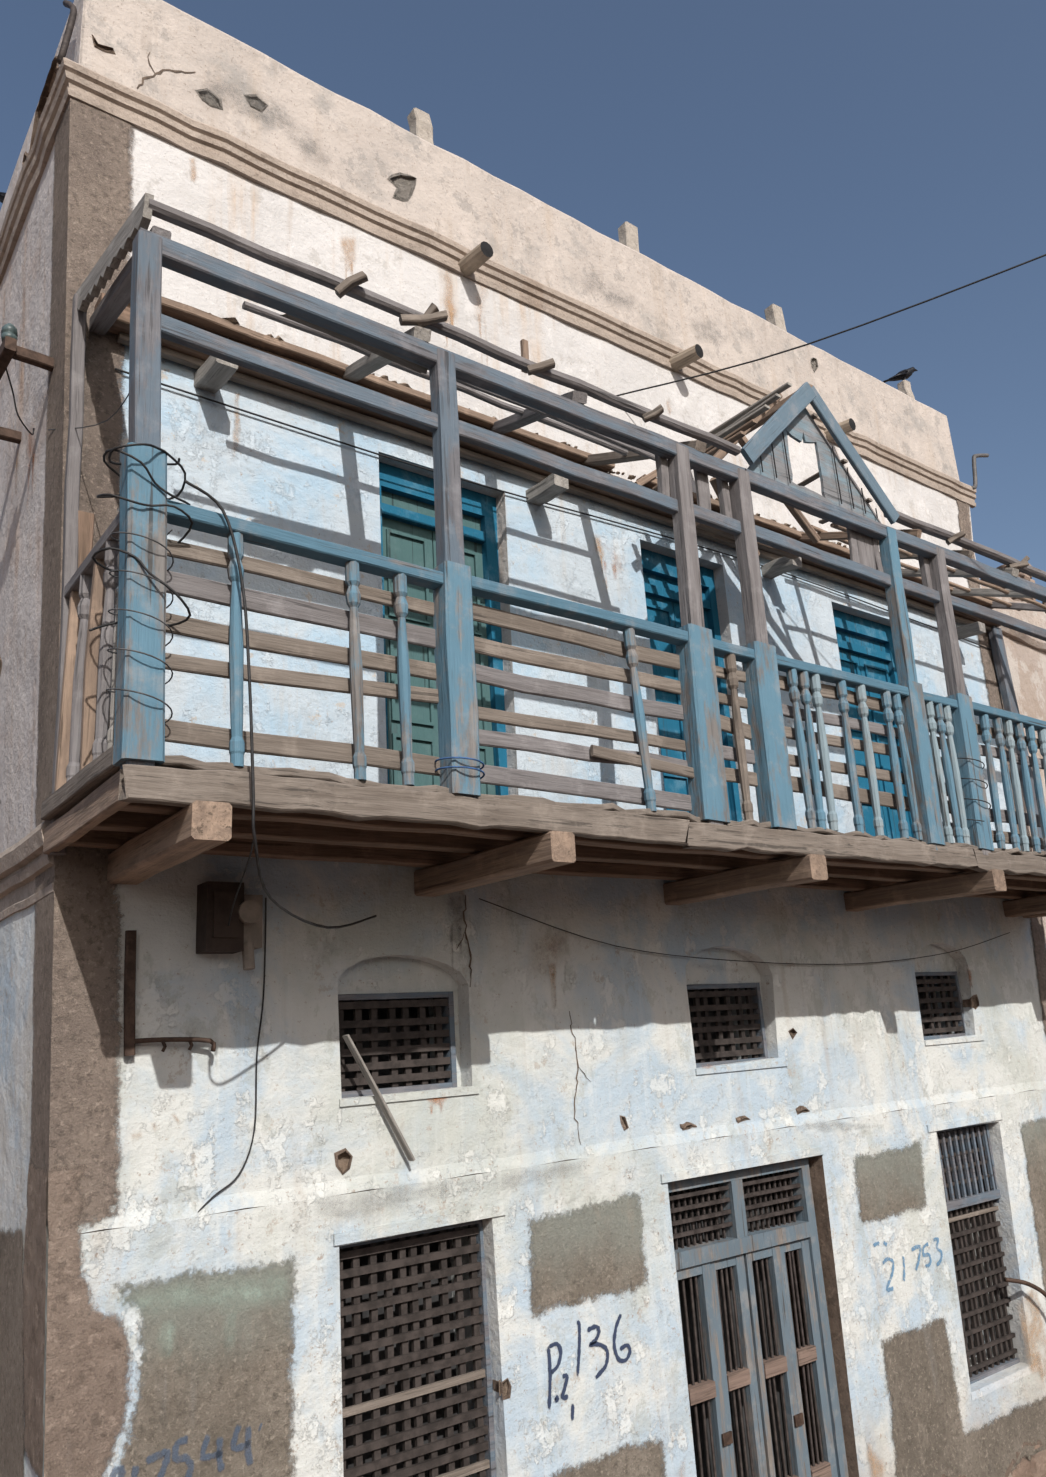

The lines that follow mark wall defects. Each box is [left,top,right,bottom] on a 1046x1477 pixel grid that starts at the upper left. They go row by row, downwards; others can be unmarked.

crack [137,52,196,89]
peeling [22,56,60,166]
flaking render [499,1378,512,1400]